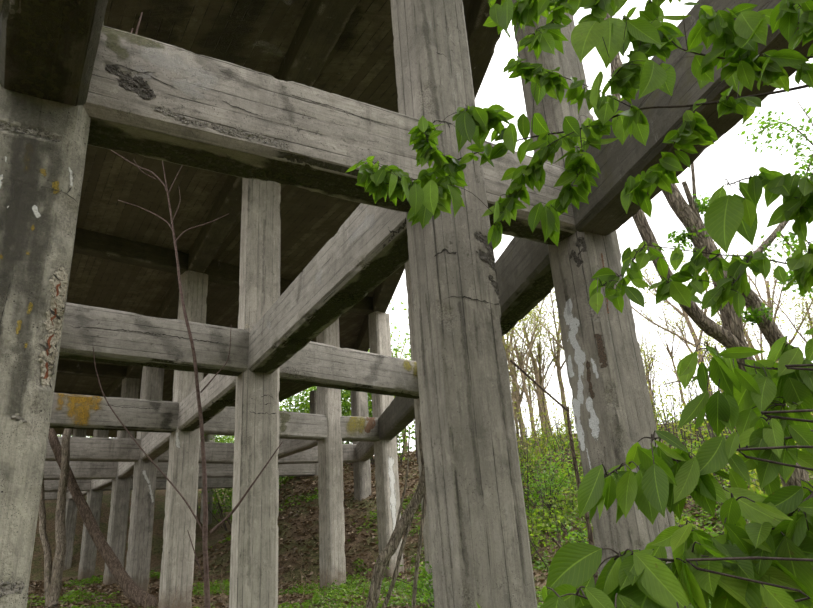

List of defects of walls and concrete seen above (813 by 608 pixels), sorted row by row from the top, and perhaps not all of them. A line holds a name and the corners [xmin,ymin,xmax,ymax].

spalling [105,64,289,150]
damp [0,0,88,415]
rust [43,283,61,379]
spalling [38,264,68,387]
peeling [563,298,608,470]